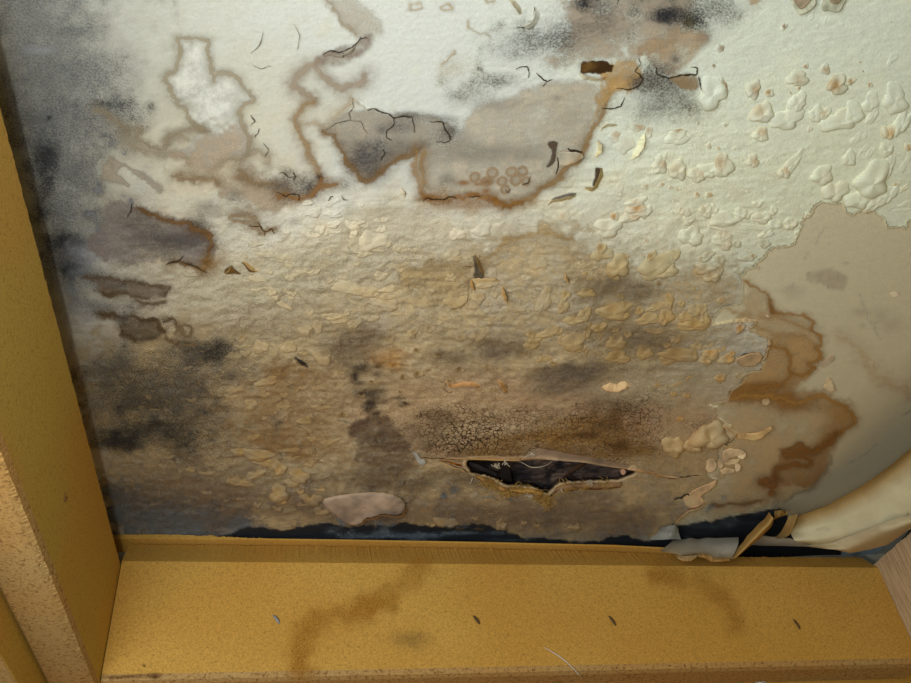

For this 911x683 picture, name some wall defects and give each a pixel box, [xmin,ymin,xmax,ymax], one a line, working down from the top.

crack [326,98,451,161]
peeling [547,141,584,174]
peeling [631,134,646,160]
peeling [585,168,604,192]
peeling [548,193,576,205]
leakage [0,0,884,558]
peeling [673,201,911,553]
crack [422,389,499,474]
peeling [323,492,407,526]